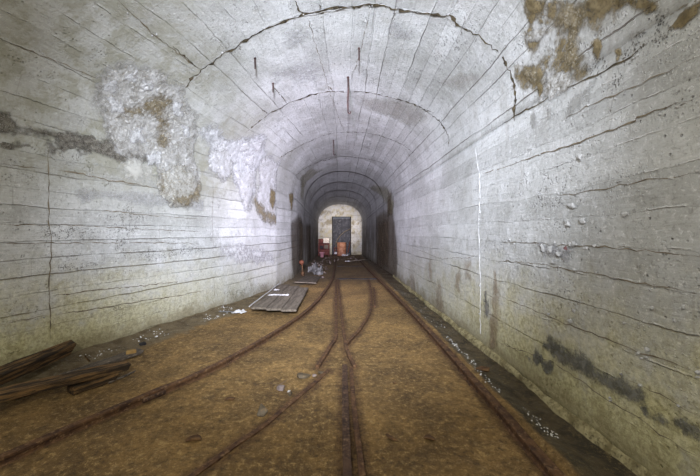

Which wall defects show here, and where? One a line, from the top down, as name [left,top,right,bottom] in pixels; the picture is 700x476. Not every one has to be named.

crack [118,0,548,158]
spalling [539,65,573,102]
crack [565,44,646,92]
crack [566,58,693,118]
leakage [94,63,281,224]
crack [474,96,700,227]
crack [2,145,216,337]
crack [419,248,481,334]
leakage [528,336,700,441]